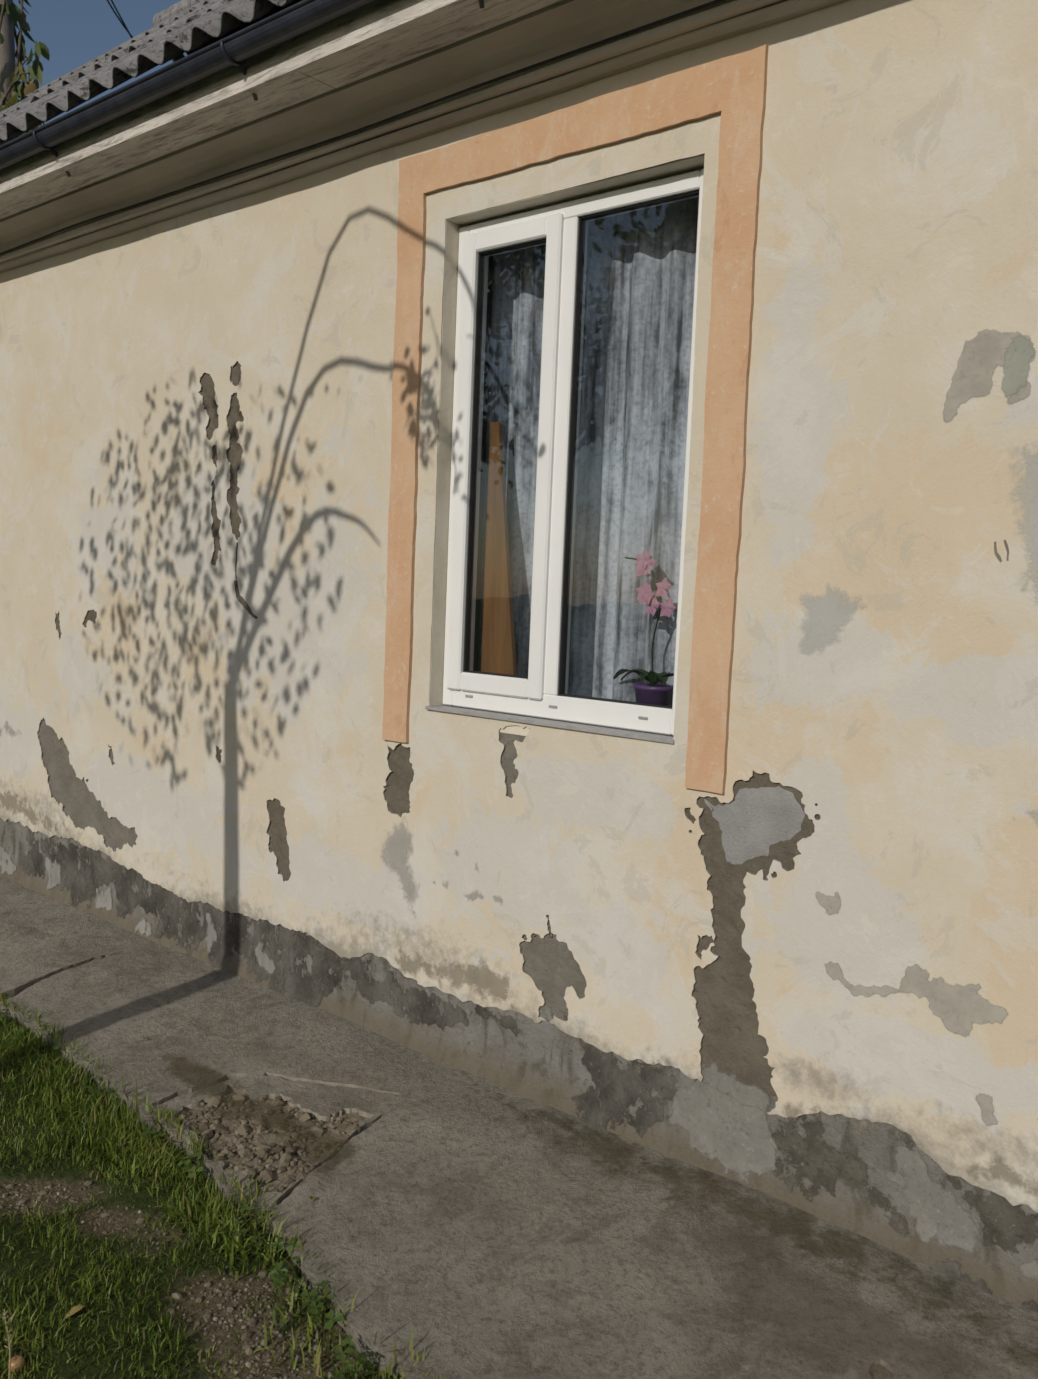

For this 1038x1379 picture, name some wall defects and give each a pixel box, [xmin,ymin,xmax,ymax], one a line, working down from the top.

peeling [943,329,1035,422]
spalling [198,361,258,619]
spalling [499,726,527,798]
peeling [22,718,522,1037]
spalling [519,915,587,1021]
spalling [684,771,821,1102]
peeling [816,891,841,915]
peeling [825,962,1008,1037]
peeling [571,1043,677,1138]
peeling [976,1094,998,1126]
peeling [771,1114,909,1236]
peeling [946,1173,1038,1254]